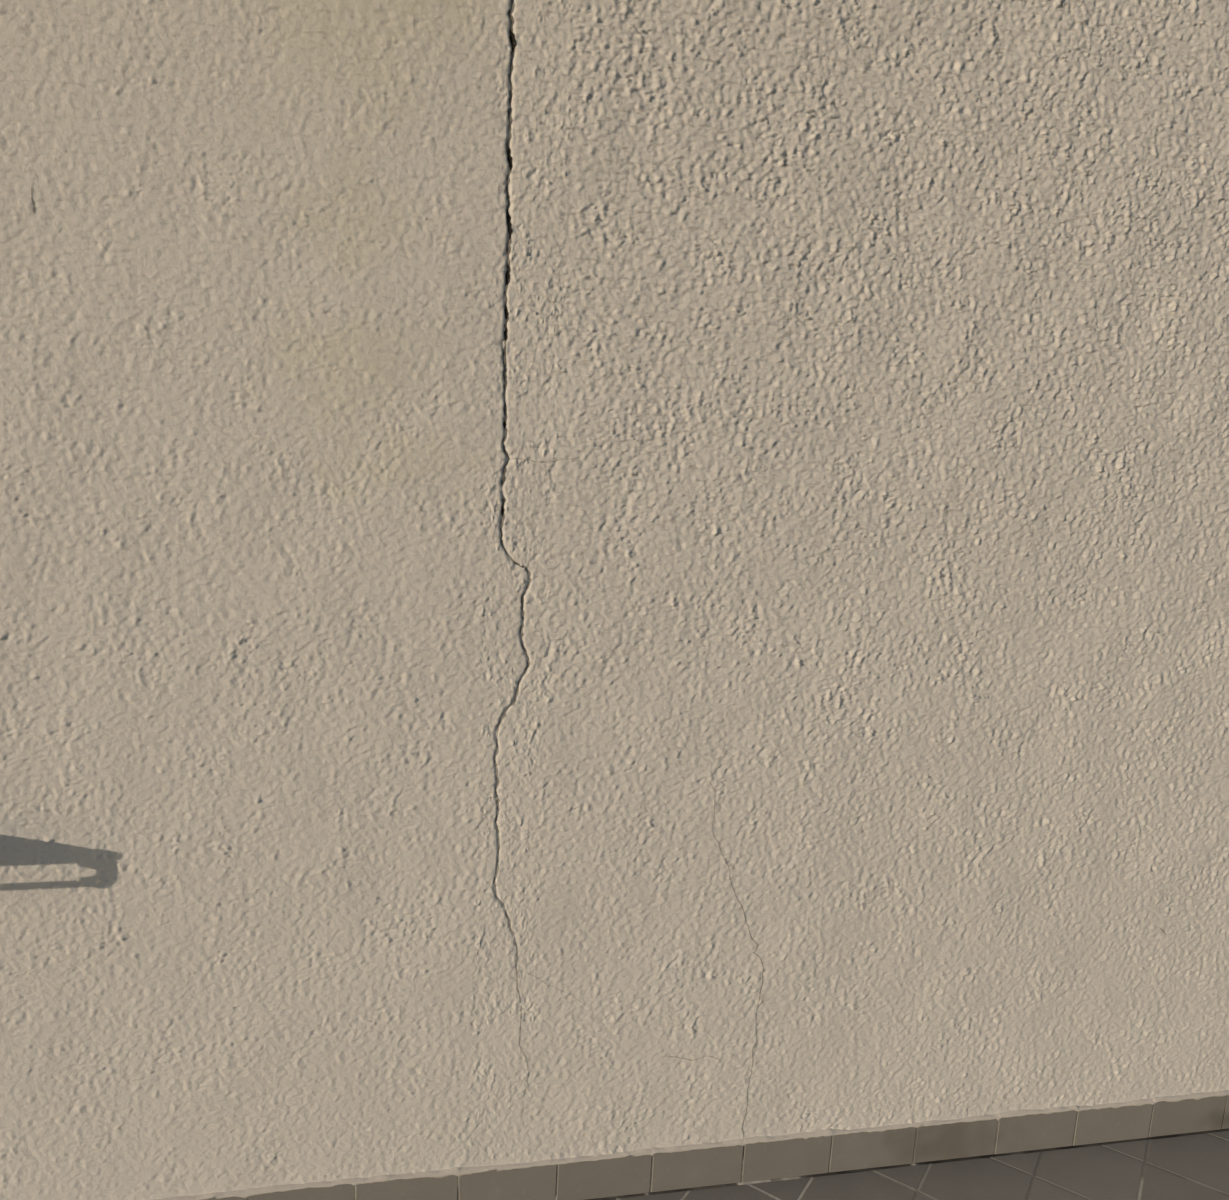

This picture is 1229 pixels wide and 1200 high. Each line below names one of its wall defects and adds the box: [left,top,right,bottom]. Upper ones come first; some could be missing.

crack [488,0,580,1113]
crack [710,712,767,1139]